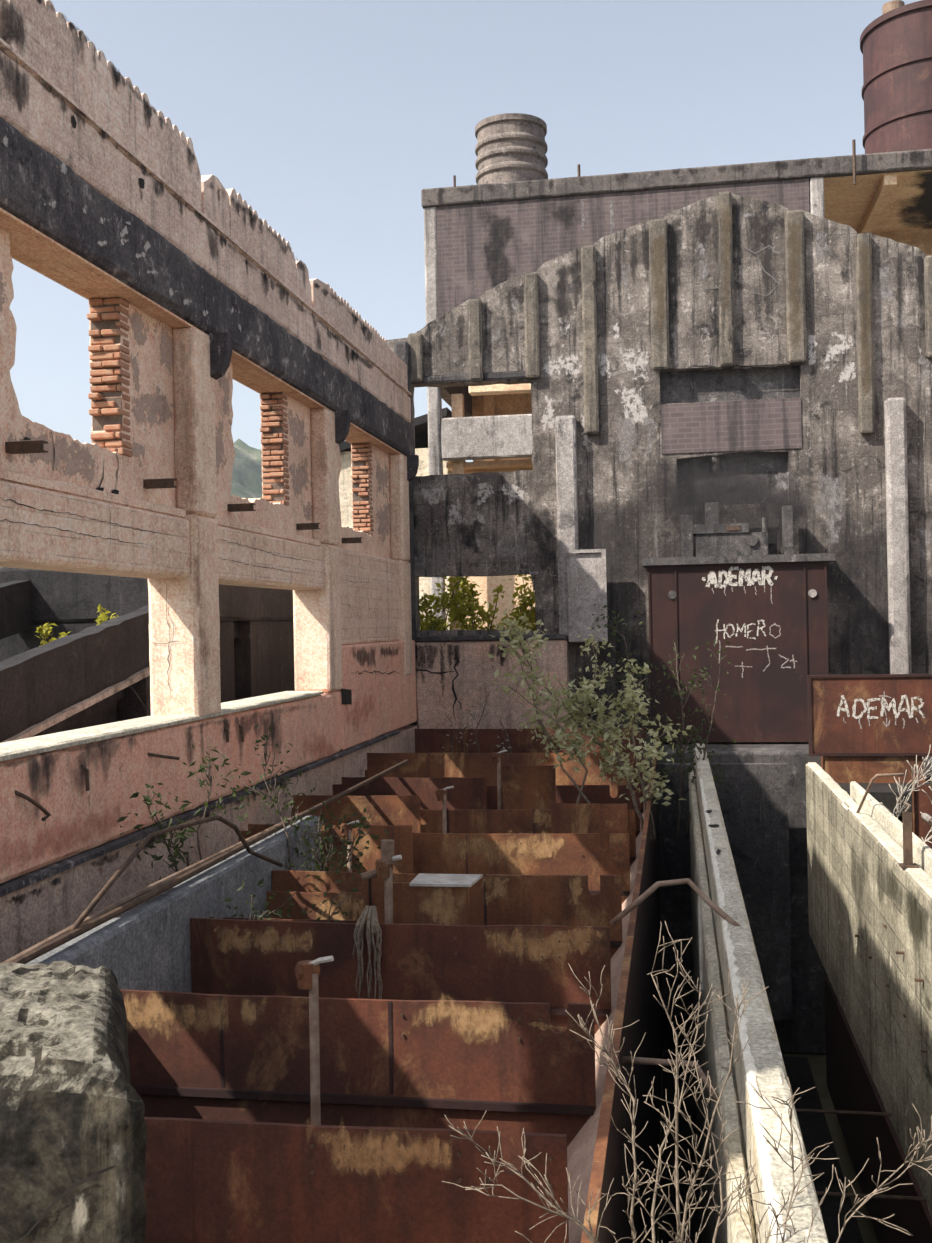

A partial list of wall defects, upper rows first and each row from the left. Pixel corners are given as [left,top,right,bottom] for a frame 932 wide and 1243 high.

water stain [483,216,524,345]
water stain [541,395,555,433]
water stain [541,262,583,383]
water stain [598,201,658,466]
water stain [667,220,682,354]
water stain [732,205,776,321]
water stain [807,332,857,383]
water stain [878,253,925,340]
crack [156,585,178,706]
corrosion [124,994,267,1039]
corrosion [413,999,507,1042]
corrosion [309,1127,451,1176]